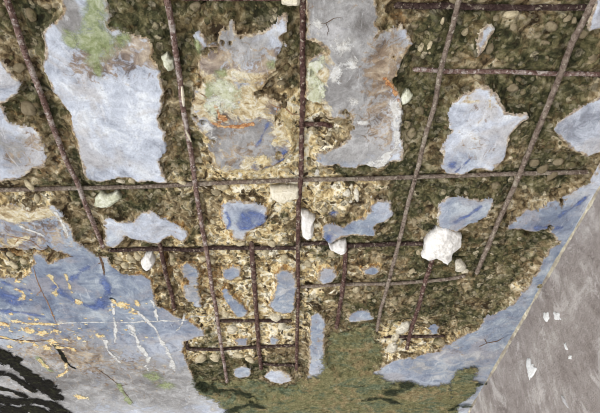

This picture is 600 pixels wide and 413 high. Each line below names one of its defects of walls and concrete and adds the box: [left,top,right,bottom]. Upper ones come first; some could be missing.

corrosion [211,105,255,129]
spalling [0,0,386,389]
spalling [261,0,600,372]
corrosion [0,313,108,377]
leakage [46,266,206,371]
corrosion [108,296,147,319]